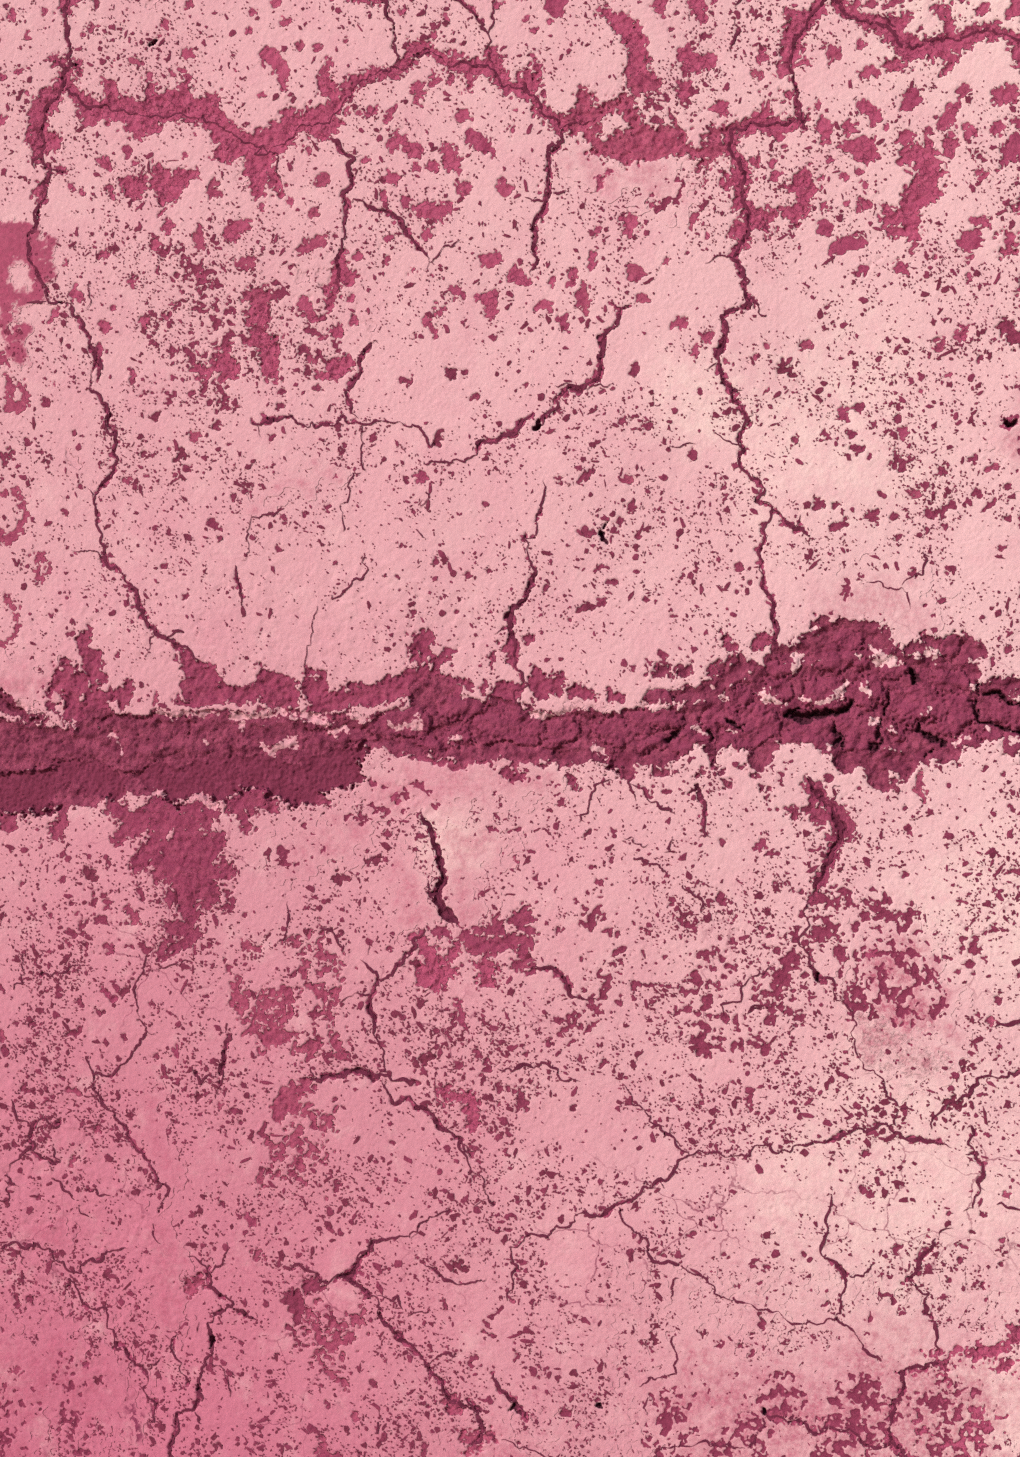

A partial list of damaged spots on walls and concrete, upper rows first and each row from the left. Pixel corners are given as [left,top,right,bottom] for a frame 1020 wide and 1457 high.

peeling [0,216,85,415]
crack [26,0,632,671]
peeling [23,0,1020,423]
crack [668,0,1020,650]
crack [495,480,546,706]
crack [0,953,258,1457]
peeling [221,917,358,1197]
peeling [406,902,540,1135]
peeling [440,1388,521,1457]
flaking render [0,578,1020,1075]
crack [277,732,1020,1457]
peeling [636,1320,1020,1457]